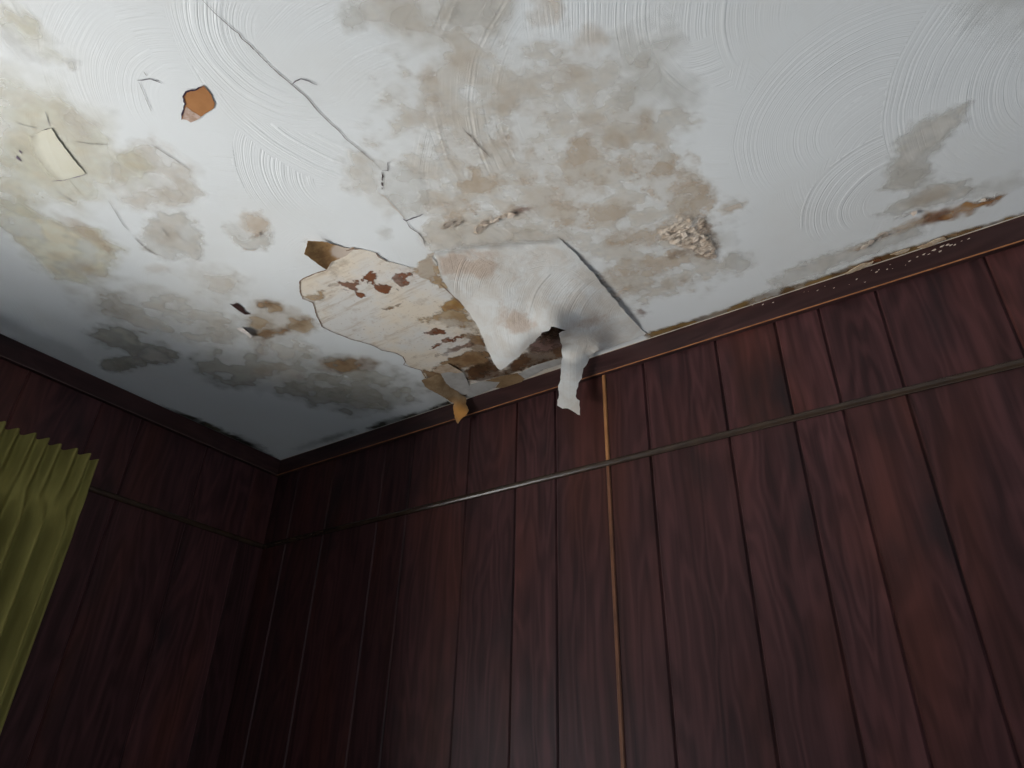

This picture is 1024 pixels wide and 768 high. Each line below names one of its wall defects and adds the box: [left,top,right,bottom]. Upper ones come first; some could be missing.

peeling [32,128,86,180]
water stain [0,100,201,282]
spalling [181,86,215,122]
crack [206,4,425,244]
water stain [368,0,746,302]
water stain [886,105,971,214]
water stain [92,297,178,370]
water stain [250,301,313,338]
water stain [187,311,451,429]
peeling [299,248,565,404]